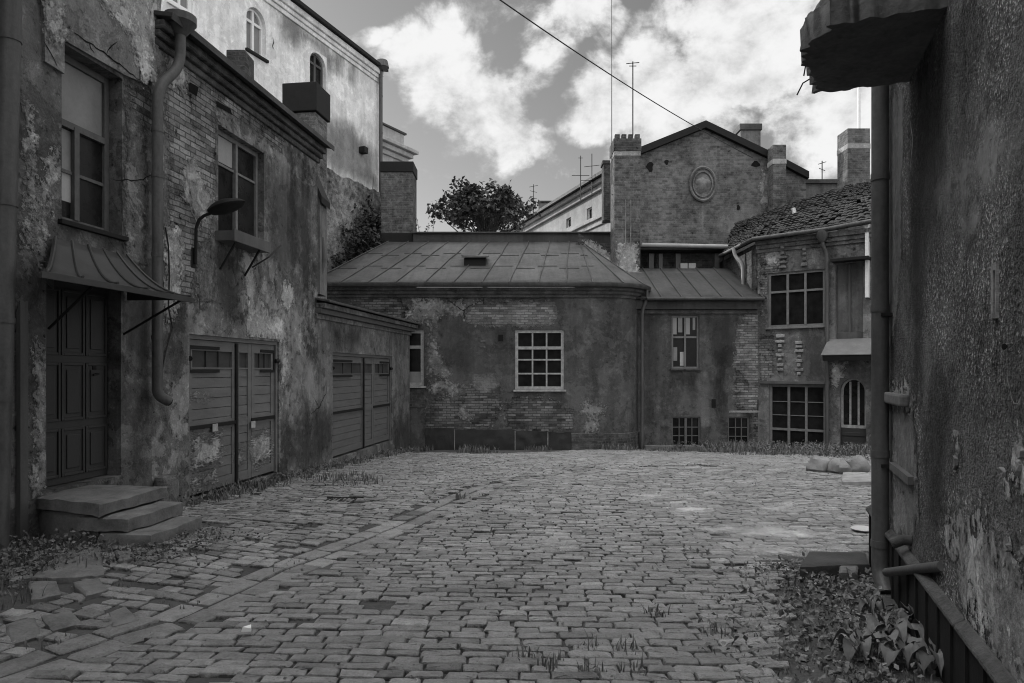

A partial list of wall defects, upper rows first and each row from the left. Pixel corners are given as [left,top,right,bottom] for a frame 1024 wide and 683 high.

crack [74,32,141,80]
flaking render [17,98,61,270]
spalling [98,0,285,325]
flaking render [28,335,47,501]
peeling [190,425,274,496]
spalling [350,297,610,433]
flaking render [939,430,1024,683]